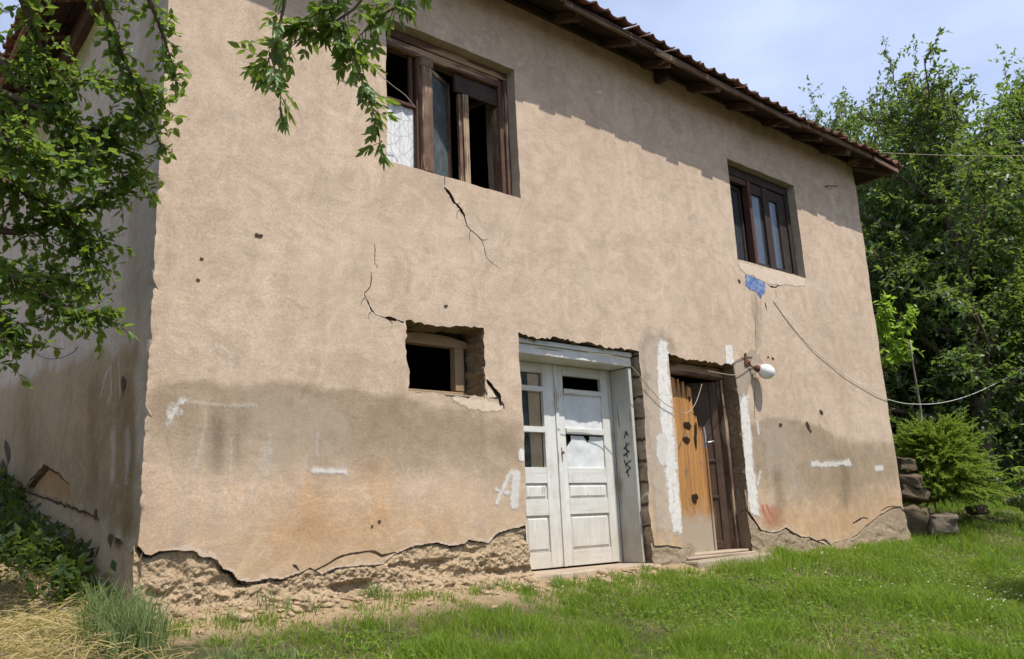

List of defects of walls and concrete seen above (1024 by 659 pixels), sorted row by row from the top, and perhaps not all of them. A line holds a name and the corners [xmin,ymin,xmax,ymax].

crack [441,177,496,266]
crack [360,244,406,328]
crack [485,376,506,409]
spalling [0,440,538,616]
spalling [745,490,913,553]